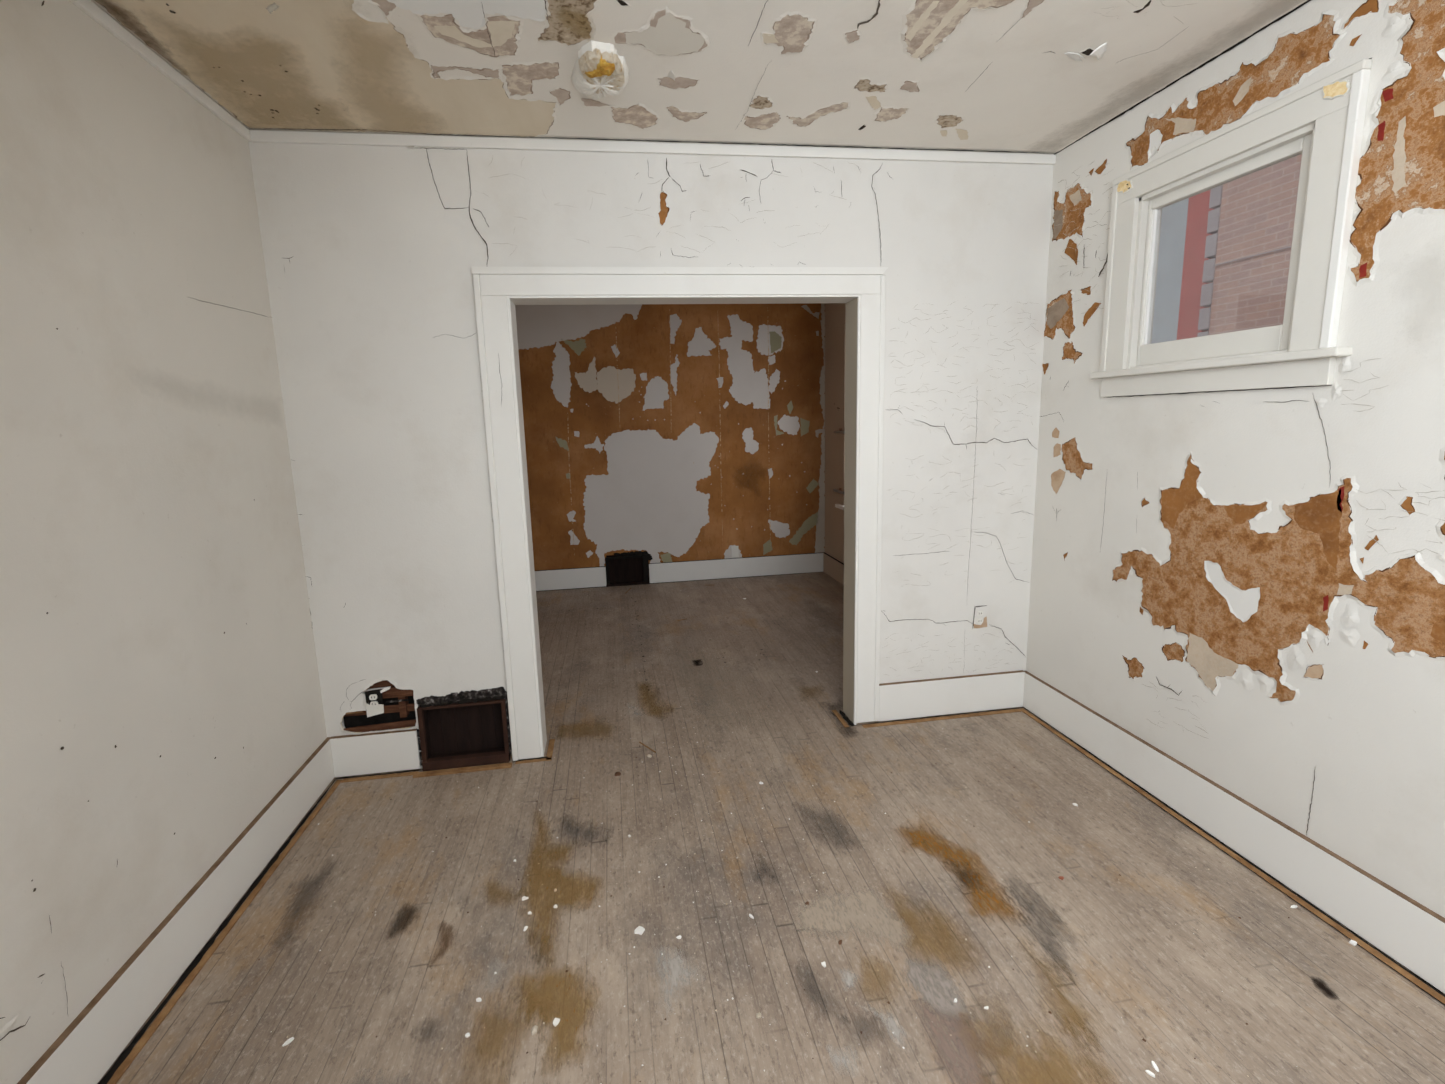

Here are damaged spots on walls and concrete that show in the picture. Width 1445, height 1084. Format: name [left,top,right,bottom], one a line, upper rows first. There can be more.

peeling [91,0,710,148]
peeling [760,11,818,55]
peeling [742,78,921,131]
peeling [843,0,880,44]
peeling [900,0,1046,62]
peeling [1117,0,1445,287]
crack [425,148,524,262]
peeling [1051,157,1108,265]
peeling [1042,285,1101,375]
peeling [518,303,825,564]
peeling [1051,428,1095,494]
peeling [1111,450,1445,706]